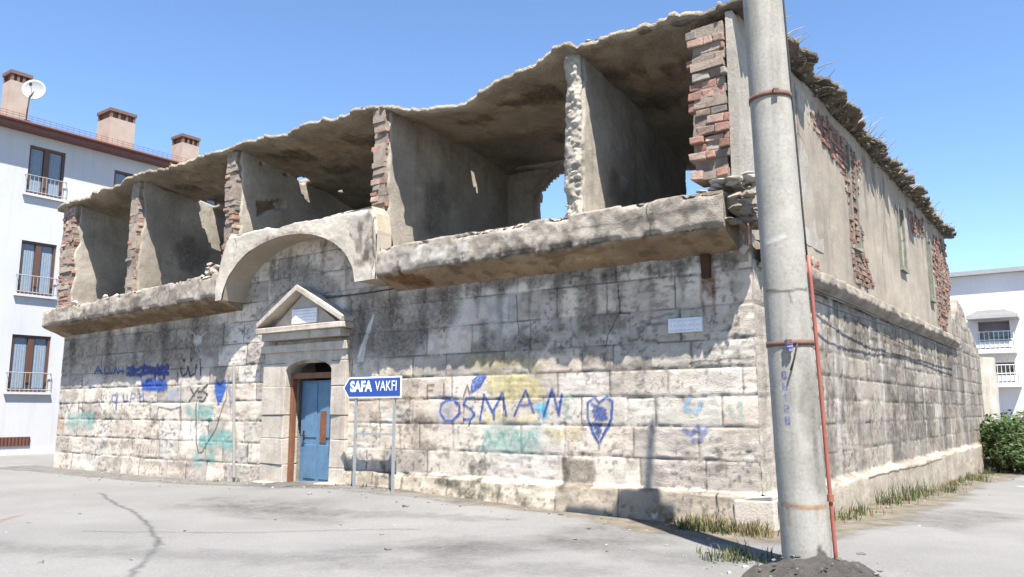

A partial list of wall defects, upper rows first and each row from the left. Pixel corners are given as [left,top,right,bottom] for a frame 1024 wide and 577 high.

flaking render [56,205,81,309]
flaking render [124,180,145,293]
flaking render [201,151,242,277]
flaking render [350,107,468,269]
flaking render [685,20,759,254]
spalling [810,111,875,289]
spalling [907,208,951,332]